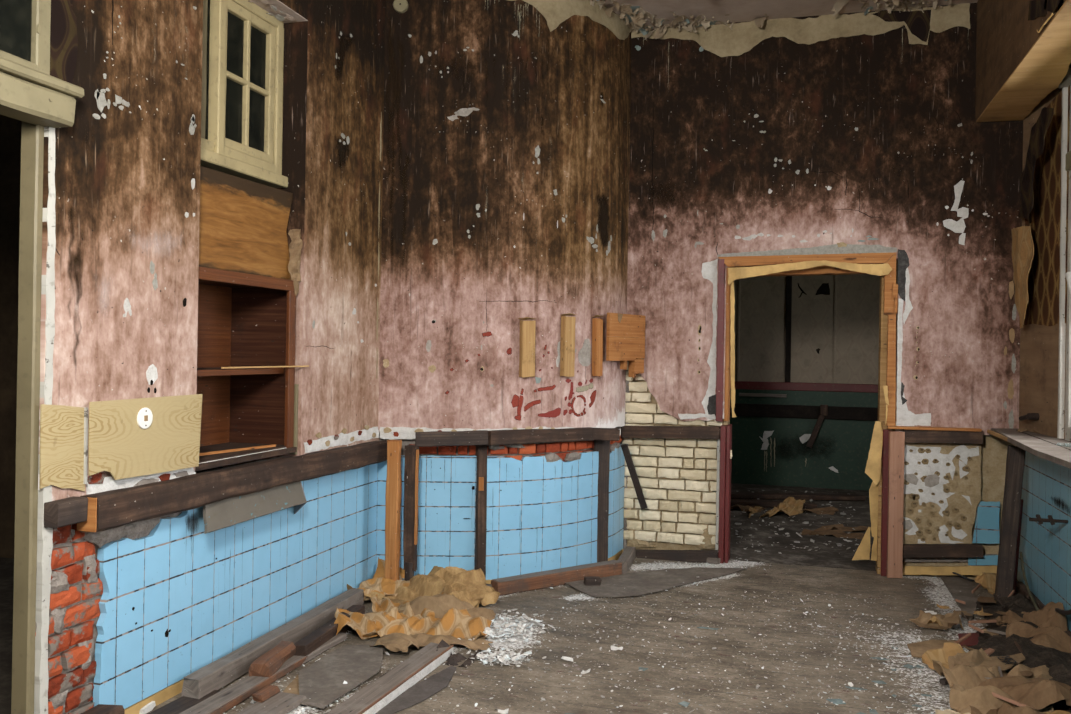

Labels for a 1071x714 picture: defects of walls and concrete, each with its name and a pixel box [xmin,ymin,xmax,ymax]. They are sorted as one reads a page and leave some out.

peeling [619,5,735,51]
peeling [92,73,131,119]
peeling [447,107,480,121]
leakage [338,140,347,165]
leakage [68,210,81,298]
peeling [587,224,612,255]
leakage [598,197,608,245]
peeling [936,180,990,245]
flaking render [610,223,897,549]
flaking render [304,425,597,462]
flaking render [903,443,981,544]
flaking render [35,517,160,714]